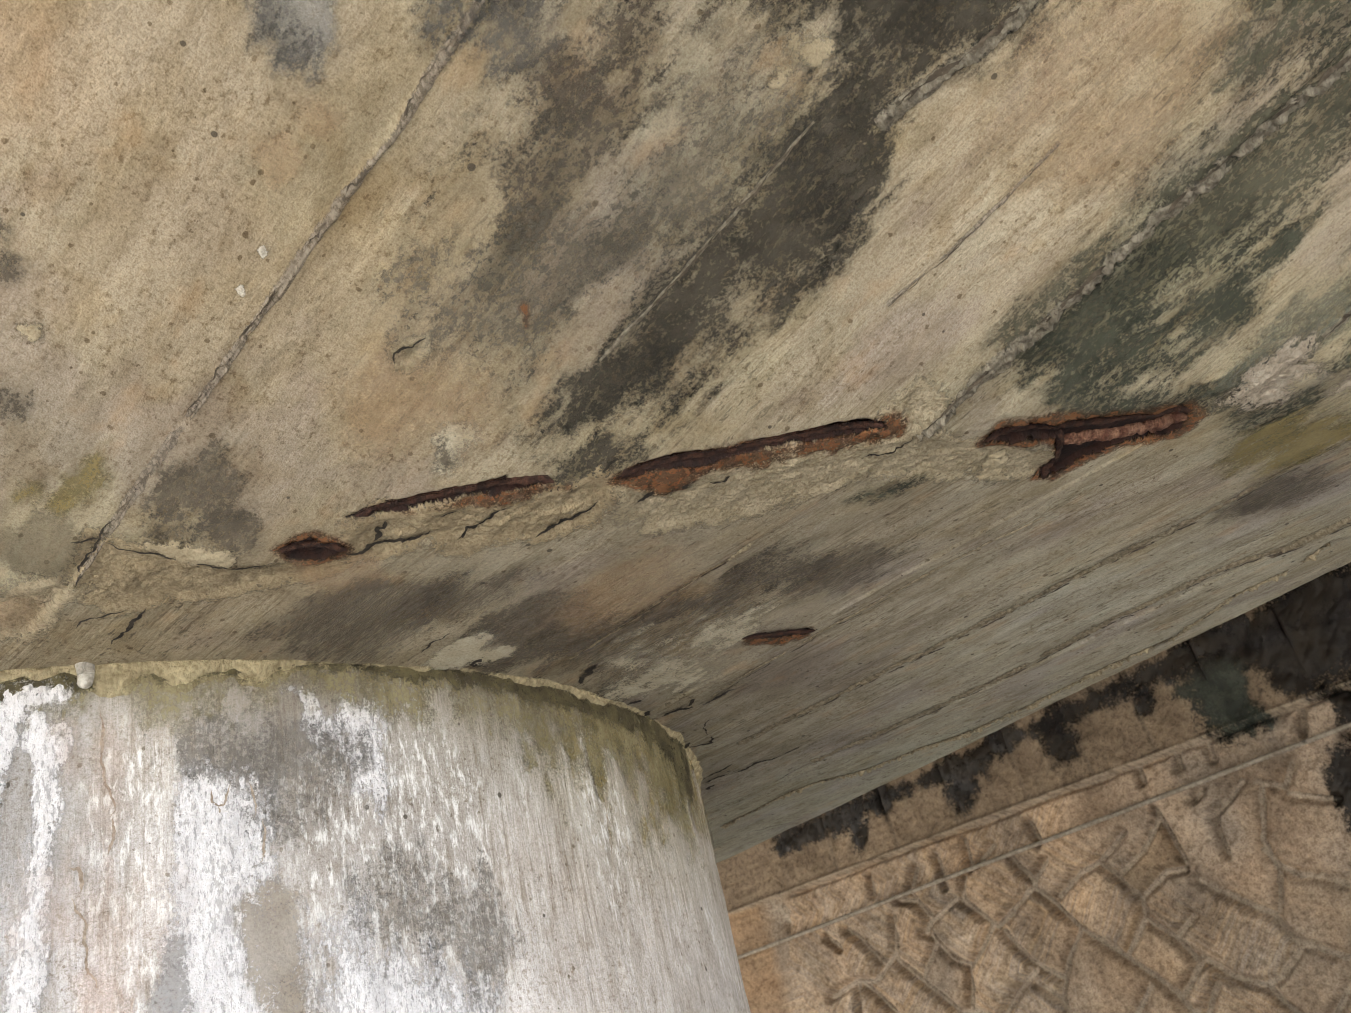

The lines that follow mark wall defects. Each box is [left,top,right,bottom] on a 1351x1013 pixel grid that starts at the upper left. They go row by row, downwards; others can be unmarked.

leakage [377,0,1053,492]
leakage [987,0,1351,383]
crack [74,609,146,644]
crack [71,519,276,587]
spalling [0,324,1351,643]